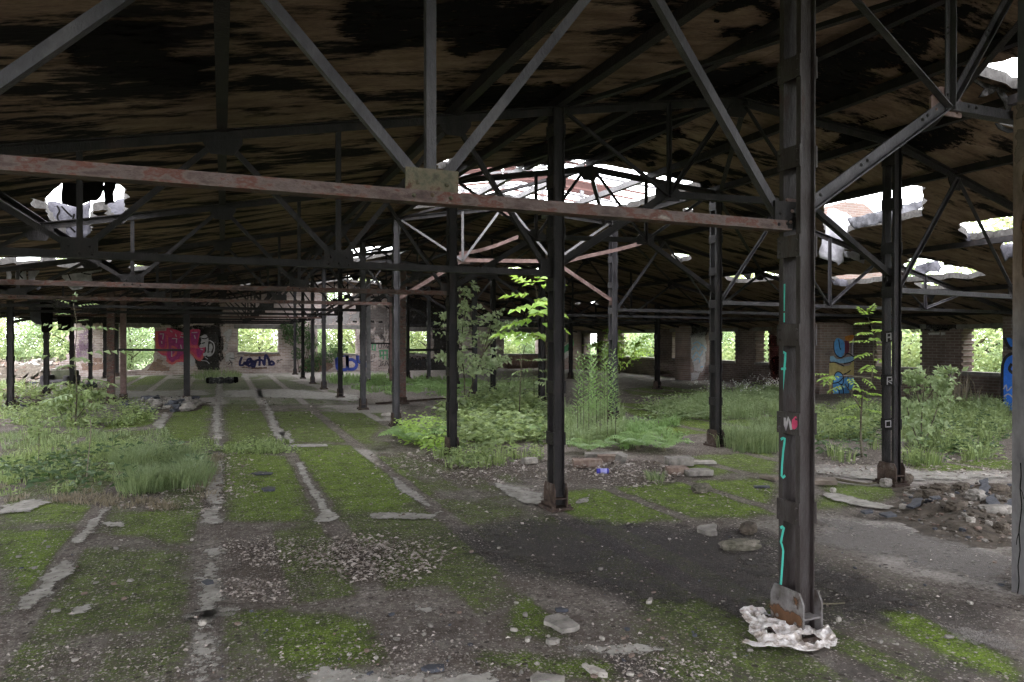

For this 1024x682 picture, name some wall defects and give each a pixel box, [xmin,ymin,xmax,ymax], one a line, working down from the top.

rust [769,597,803,637]